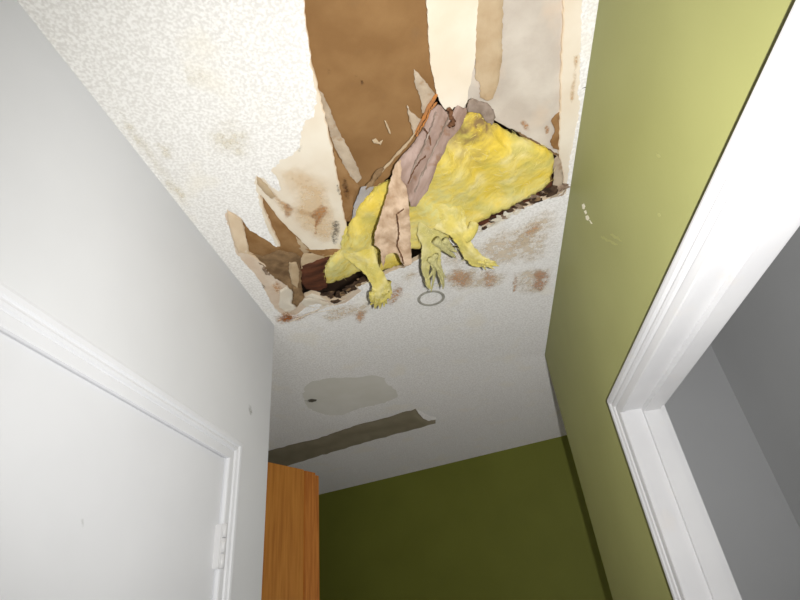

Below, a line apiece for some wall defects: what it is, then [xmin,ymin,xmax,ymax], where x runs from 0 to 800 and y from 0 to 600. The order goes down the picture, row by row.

peeling [254,61,346,250]
peeling [514,0,582,209]
peeling [225,210,361,316]
leakage [526,271,548,289]